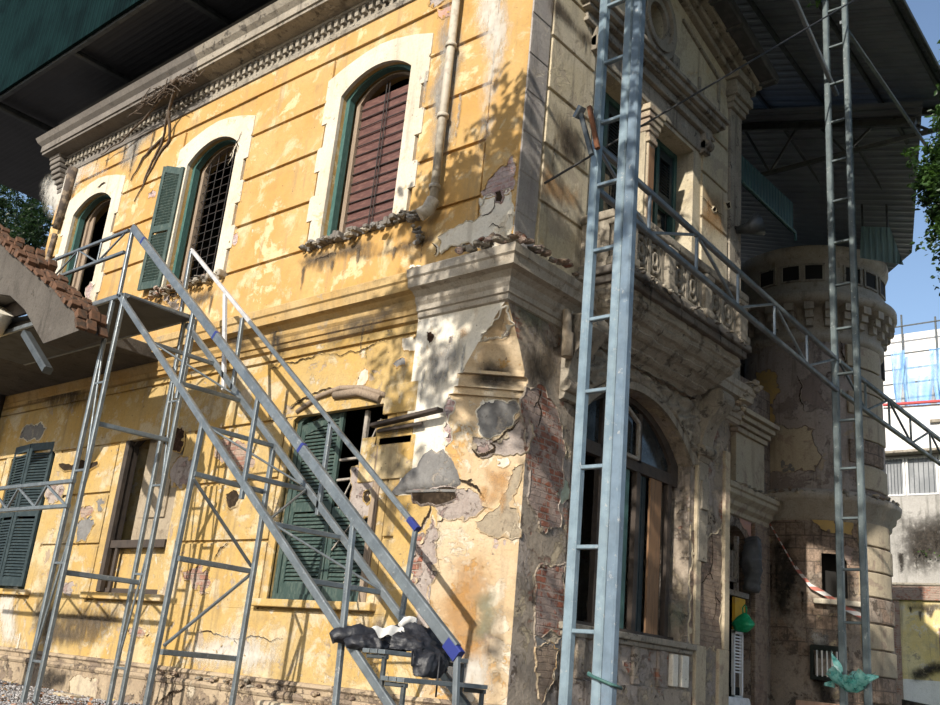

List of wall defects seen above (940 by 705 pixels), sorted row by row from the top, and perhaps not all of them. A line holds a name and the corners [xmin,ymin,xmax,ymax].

damp [546,119,585,199]
spalling [298,209,425,249]
peeling [437,154,584,282]
spalling [213,437,256,473]
crack [459,387,542,498]
peeling [75,497,105,544]
spalling [411,382,570,607]
damp [898,519,940,572]
spalling [180,565,212,596]
damp [35,604,116,642]
spalling [533,562,566,703]
damp [913,663,940,680]